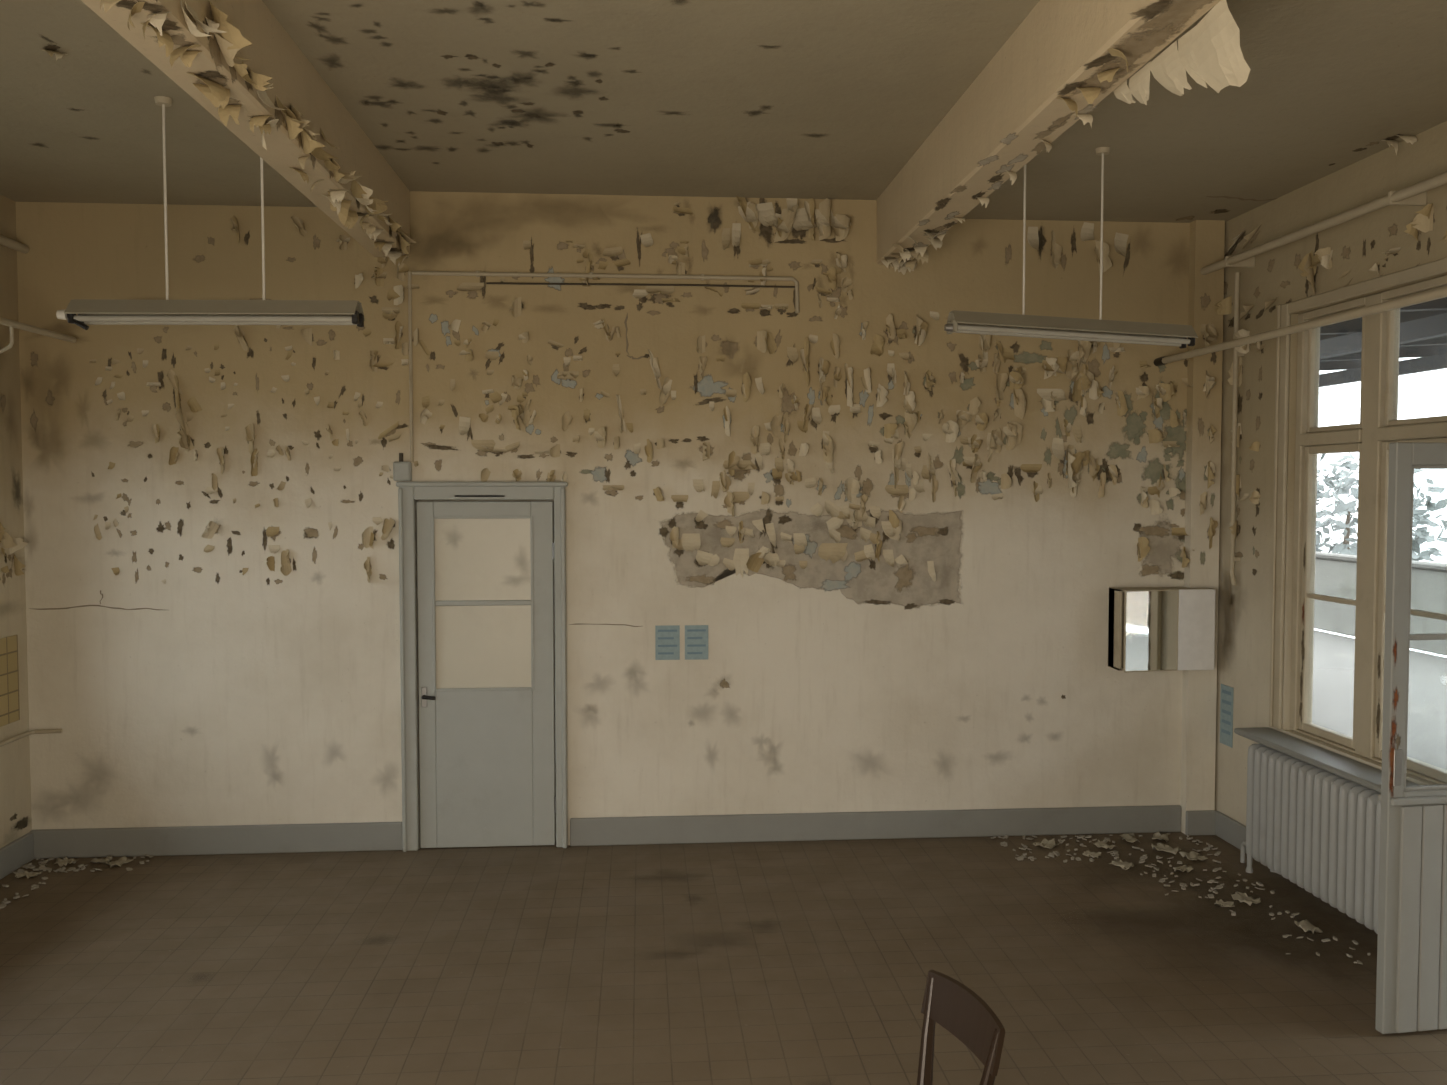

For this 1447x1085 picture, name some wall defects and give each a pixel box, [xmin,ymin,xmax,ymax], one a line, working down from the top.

leakage [441,52,554,152]
leakage [562,54,608,117]
flaking render [89,0,1447,609]
peeling [0,522,28,583]